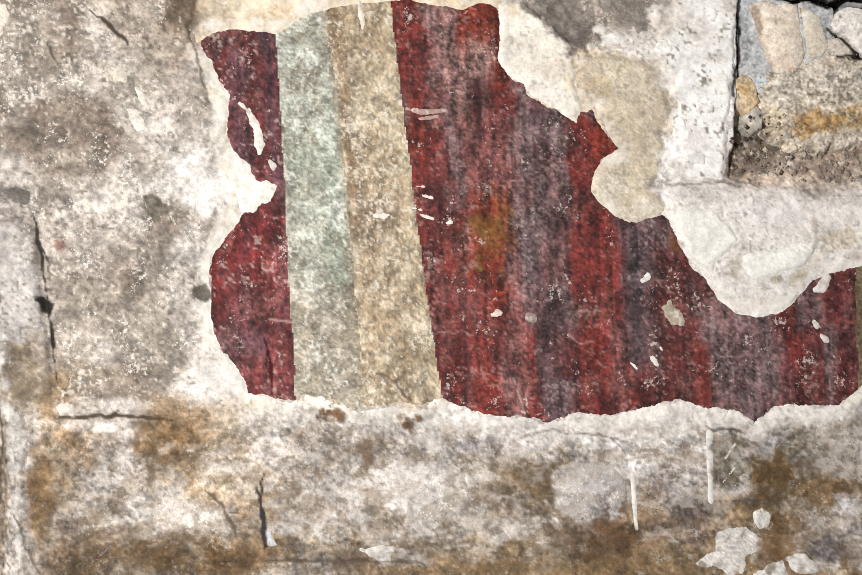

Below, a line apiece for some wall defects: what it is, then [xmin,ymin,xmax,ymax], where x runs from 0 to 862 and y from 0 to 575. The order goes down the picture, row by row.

crack [731,0,741,97]
crack [783,0,862,60]
peeling [520,0,862,318]
crack [33,218,57,379]
crack [60,412,172,421]
leakage [358,440,374,473]
crack [256,473,424,565]